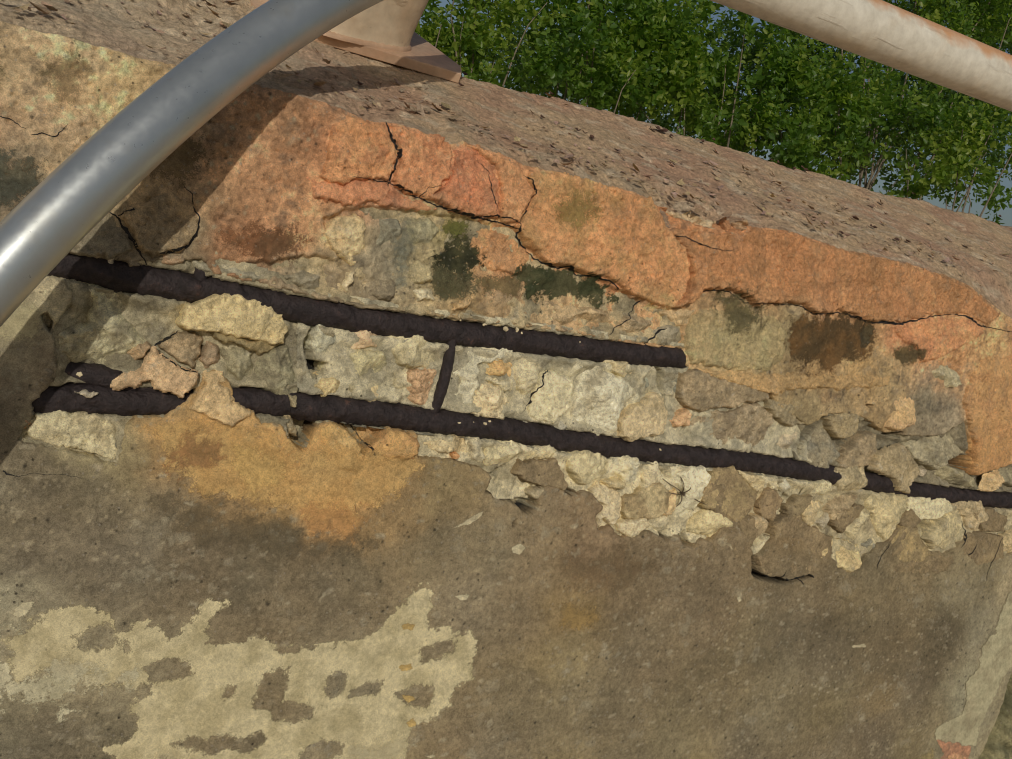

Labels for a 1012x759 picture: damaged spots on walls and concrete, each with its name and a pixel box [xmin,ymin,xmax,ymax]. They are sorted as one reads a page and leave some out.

peeling [2,0,82,24]
peeling [272,45,1003,288]
crack [109,186,200,265]
rust [47,253,687,368]
crack [354,122,640,334]
spalling [19,207,1012,577]
water stain [428,216,620,309]
water stain [783,309,879,377]
crack [703,289,1012,332]
rust [32,362,842,545]
rust [862,471,1012,509]
peeling [0,582,478,759]